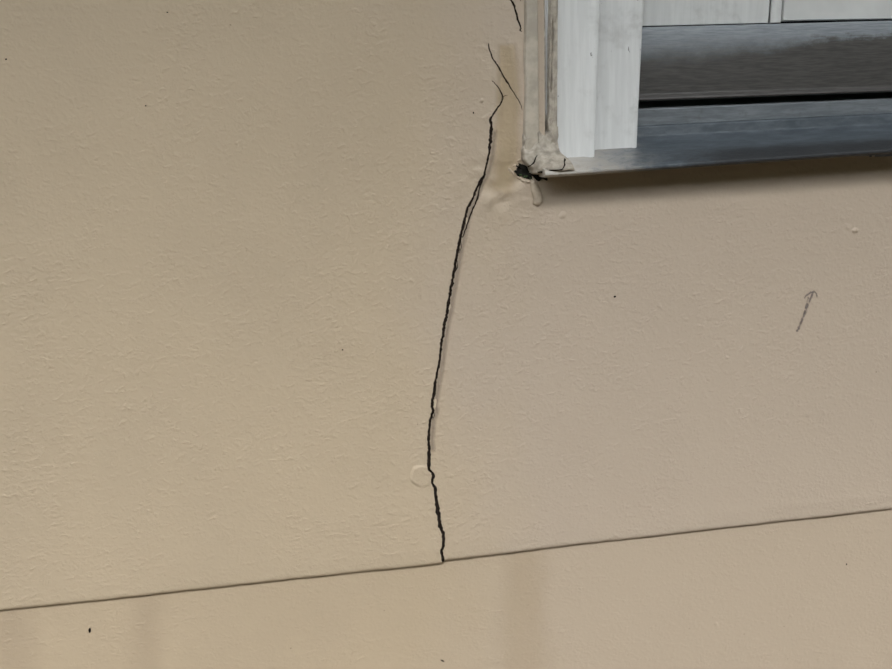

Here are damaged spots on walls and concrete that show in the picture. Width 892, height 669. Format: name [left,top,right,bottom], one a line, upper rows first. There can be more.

crack [425,43,522,562]